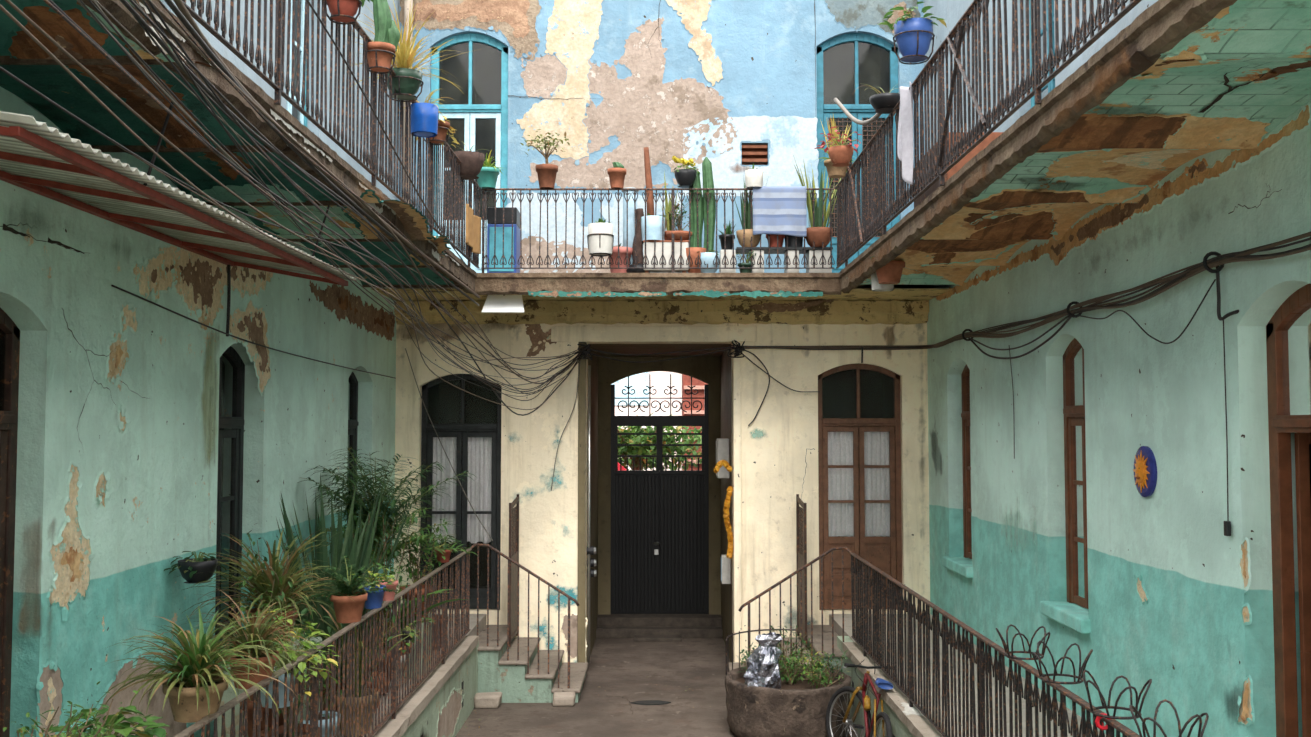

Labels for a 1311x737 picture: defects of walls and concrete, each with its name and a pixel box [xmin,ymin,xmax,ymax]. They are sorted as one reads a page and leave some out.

crack [0,222,84,254]
peeling [105,244,274,396]
flaking render [4,0,459,266]
flaking render [308,279,395,343]
peeling [400,0,738,193]
flaking render [892,101,1311,303]
crack [1198,66,1274,113]
peeling [46,461,111,622]
peeling [1236,537,1252,626]
peeling [1236,675,1255,728]